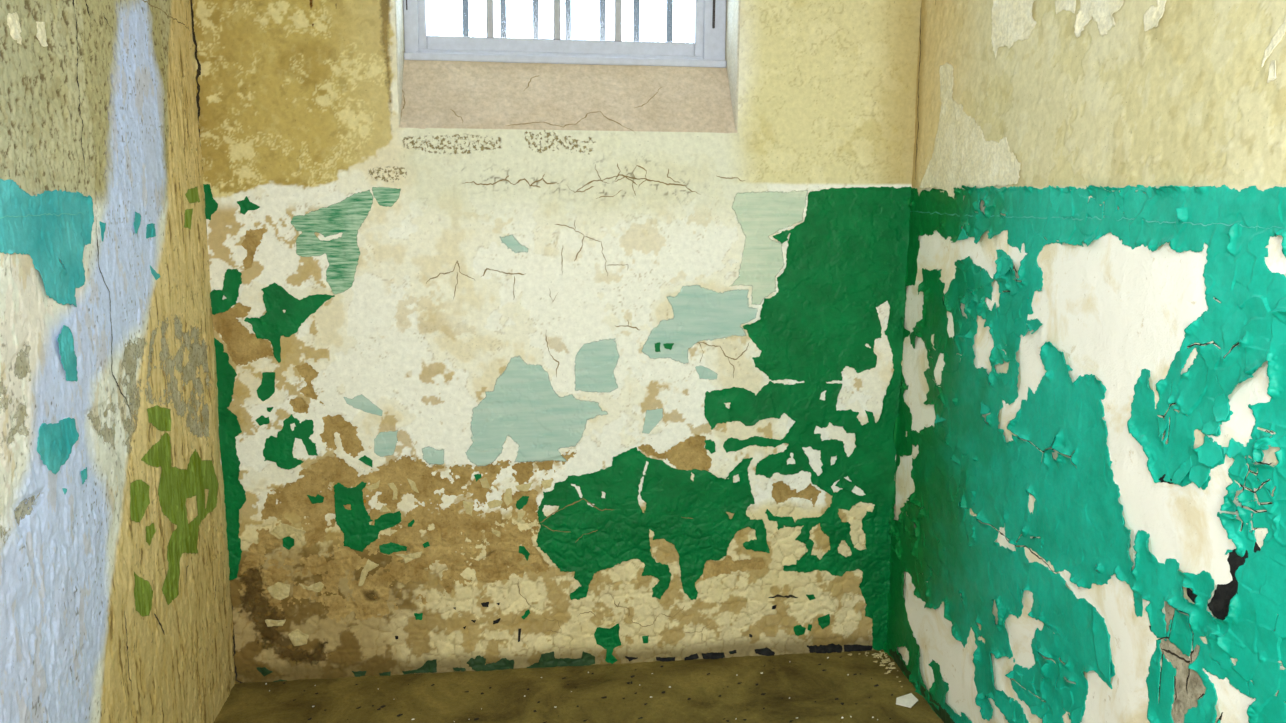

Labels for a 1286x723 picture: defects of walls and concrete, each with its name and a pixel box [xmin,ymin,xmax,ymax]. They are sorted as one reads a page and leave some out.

crack [73,0,108,165]
crack [143,0,203,169]
water stain [381,0,390,83]
water stain [403,134,501,154]
water stain [525,130,596,154]
peeling [0,179,106,307]
crack [426,261,524,299]
crack [463,163,745,302]
peeling [0,378,79,474]
flaking render [119,228,770,624]
peeling [704,62,1286,723]
water stain [240,568,328,665]